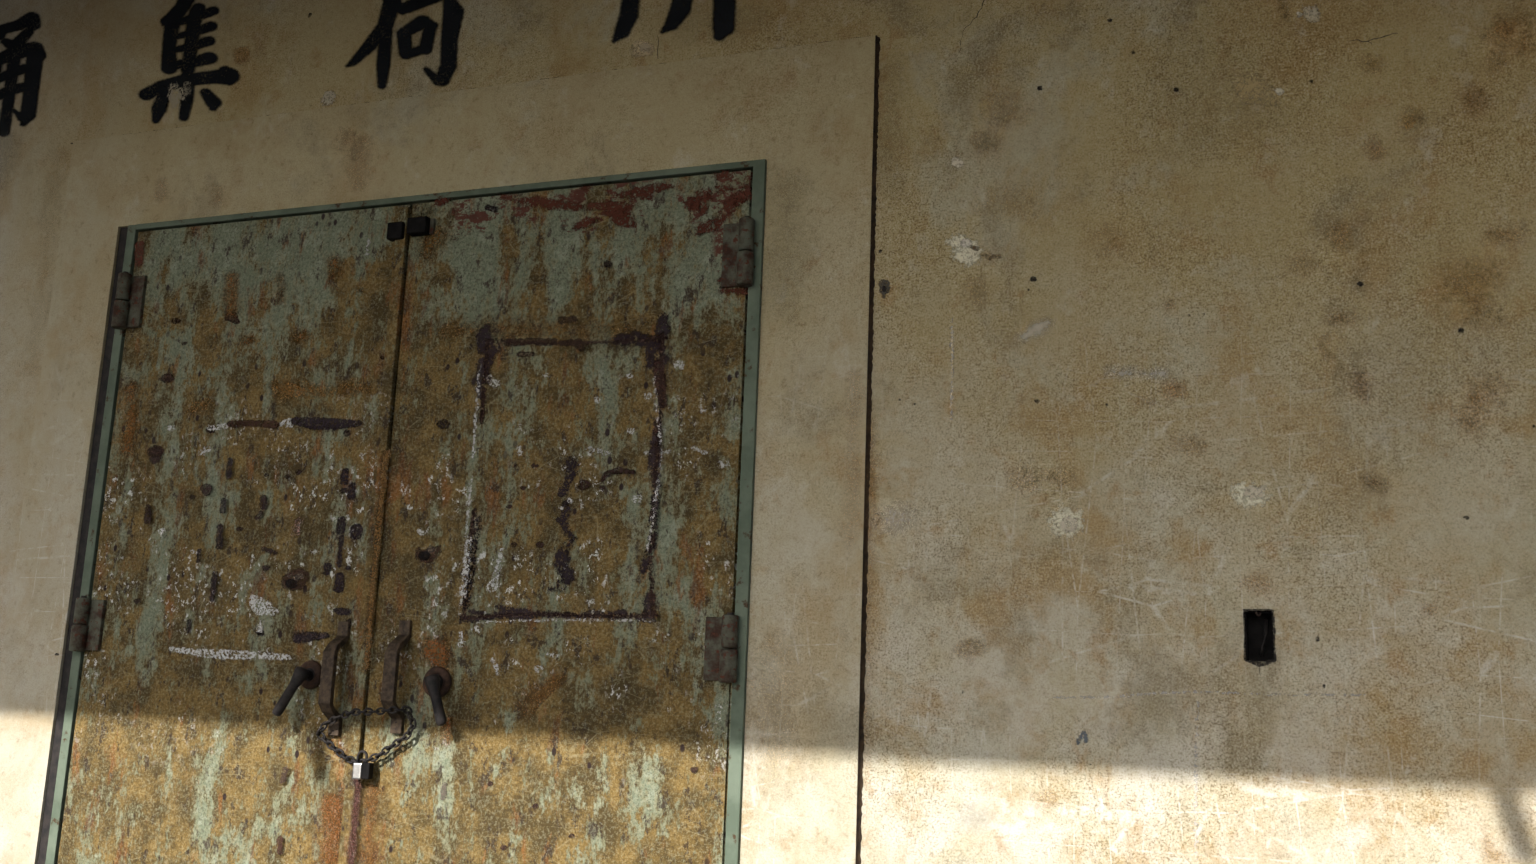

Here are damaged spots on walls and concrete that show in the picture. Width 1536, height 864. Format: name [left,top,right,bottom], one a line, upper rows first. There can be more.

peeling [484,169,752,236]
flaking render [945,233,983,268]
corrosion [316,779,379,864]